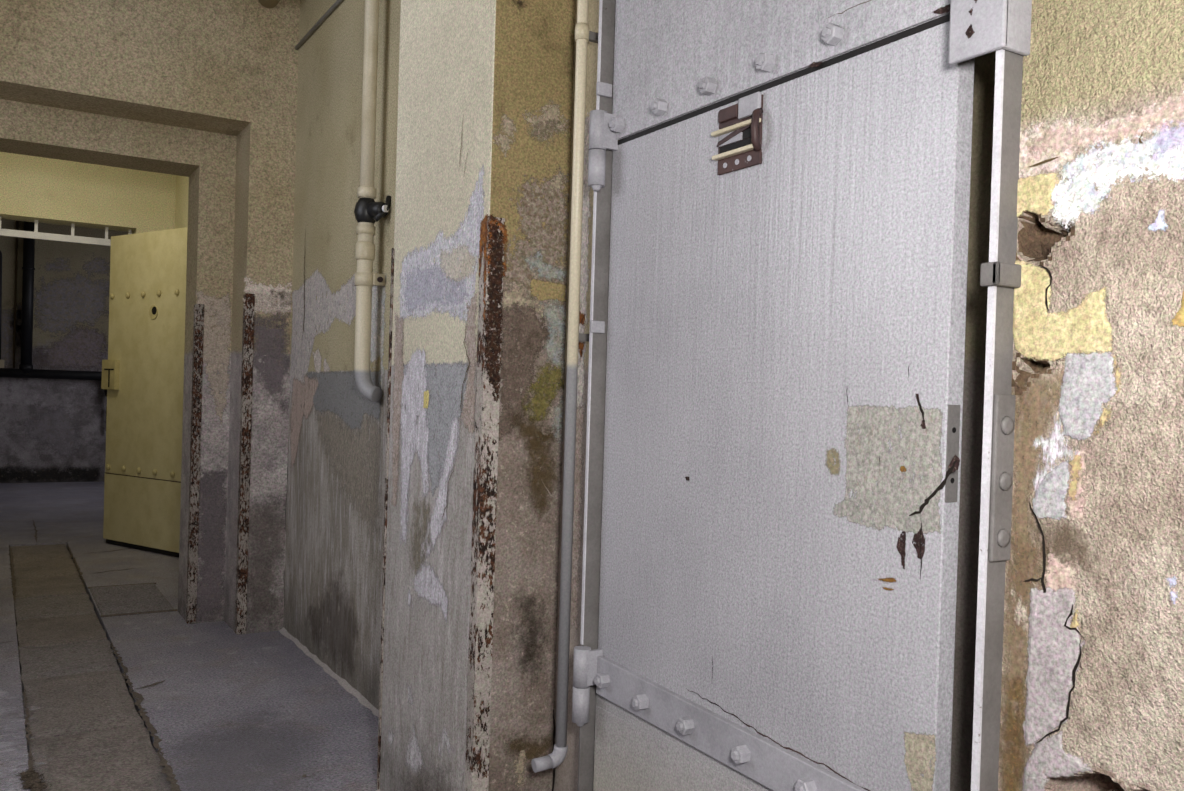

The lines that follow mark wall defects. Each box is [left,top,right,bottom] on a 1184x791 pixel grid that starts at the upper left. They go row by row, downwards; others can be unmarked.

peeling [193,269,356,424]
peeling [370,168,485,507]
rust [478,214,508,398]
peeling [1011,91,1184,524]
crack [1026,501,1046,593]
crack [1037,605,1082,743]
peeling [1022,553,1164,791]
peeling [1167,576,1178,604]